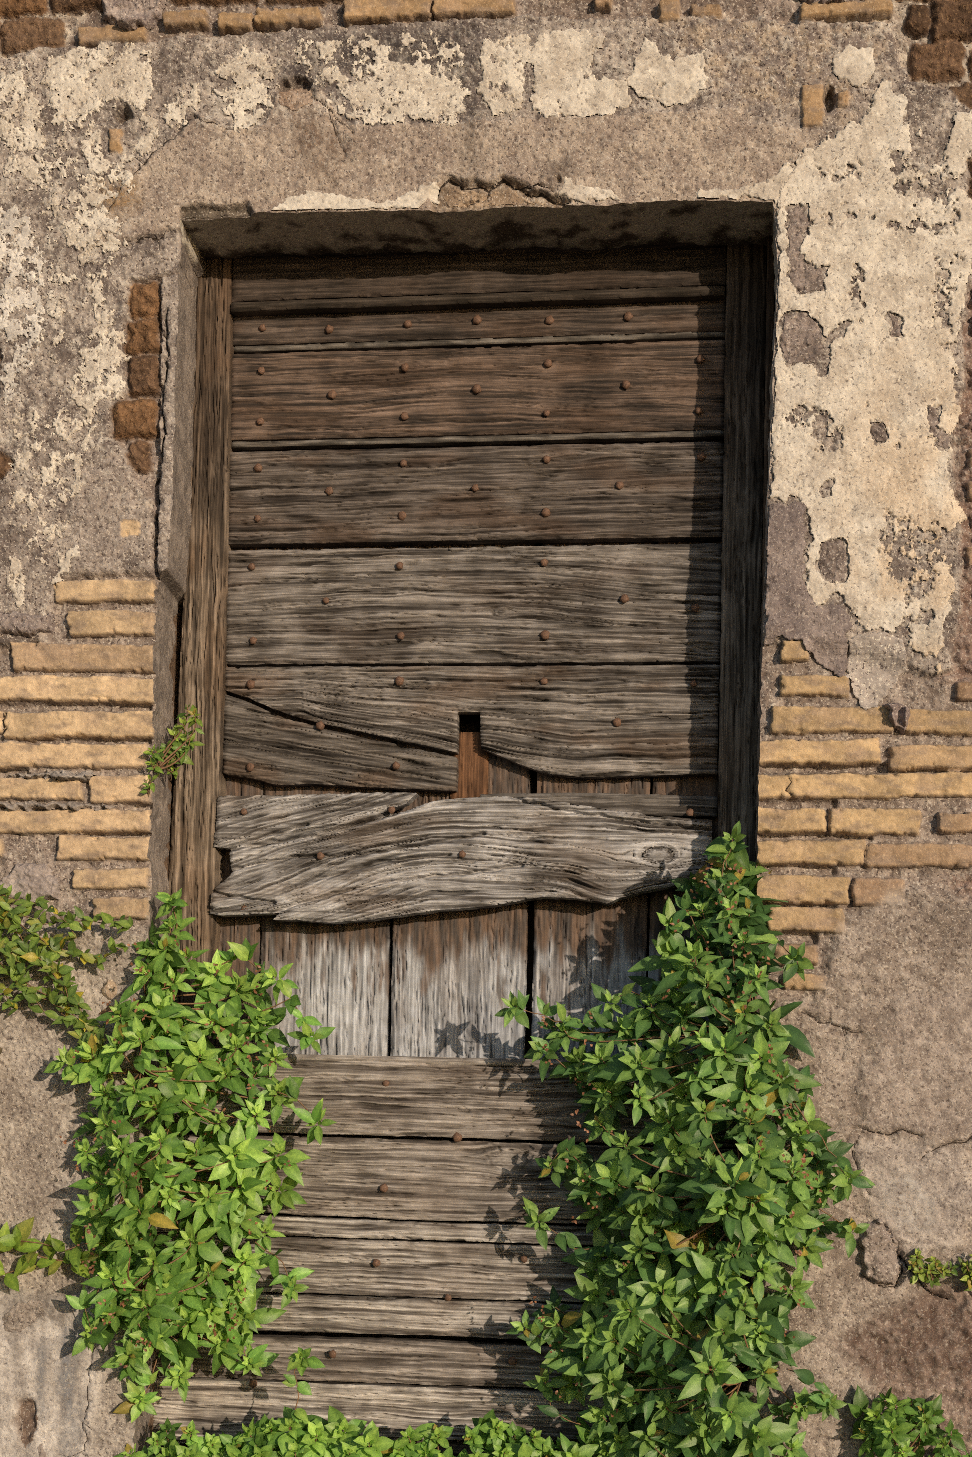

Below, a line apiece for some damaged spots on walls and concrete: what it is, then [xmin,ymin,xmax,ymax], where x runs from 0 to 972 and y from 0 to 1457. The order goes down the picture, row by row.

peeling [0,28,709,608]
peeling [695,44,972,711]
crack [852,1127,972,1194]